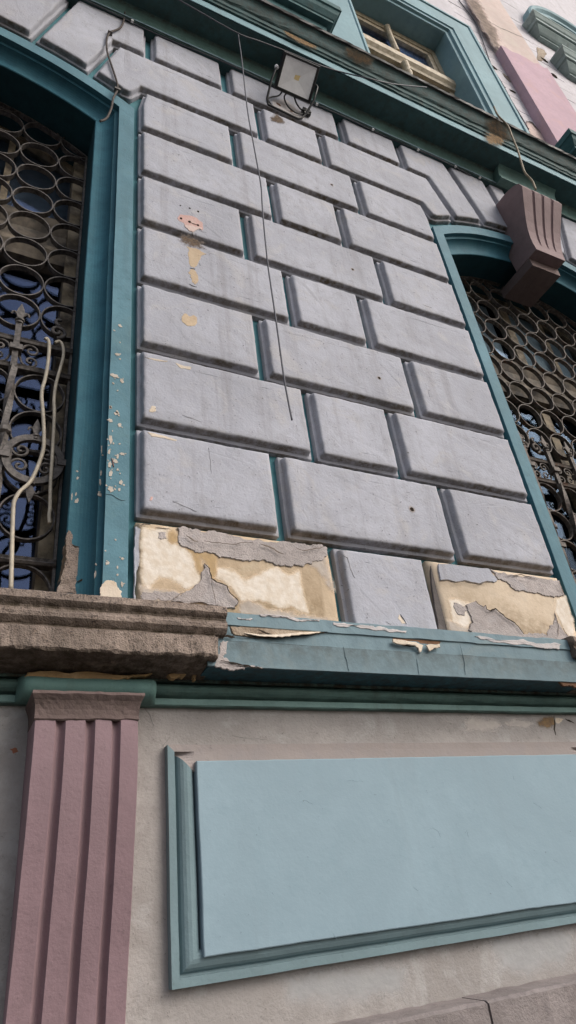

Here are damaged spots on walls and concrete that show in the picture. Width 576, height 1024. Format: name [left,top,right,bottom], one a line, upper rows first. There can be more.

leakage [87,0,277,84]
spalling [468,0,500,46]
peeling [187,247,206,287]
peeling [97,405,126,497]
peeling [56,523,574,653]